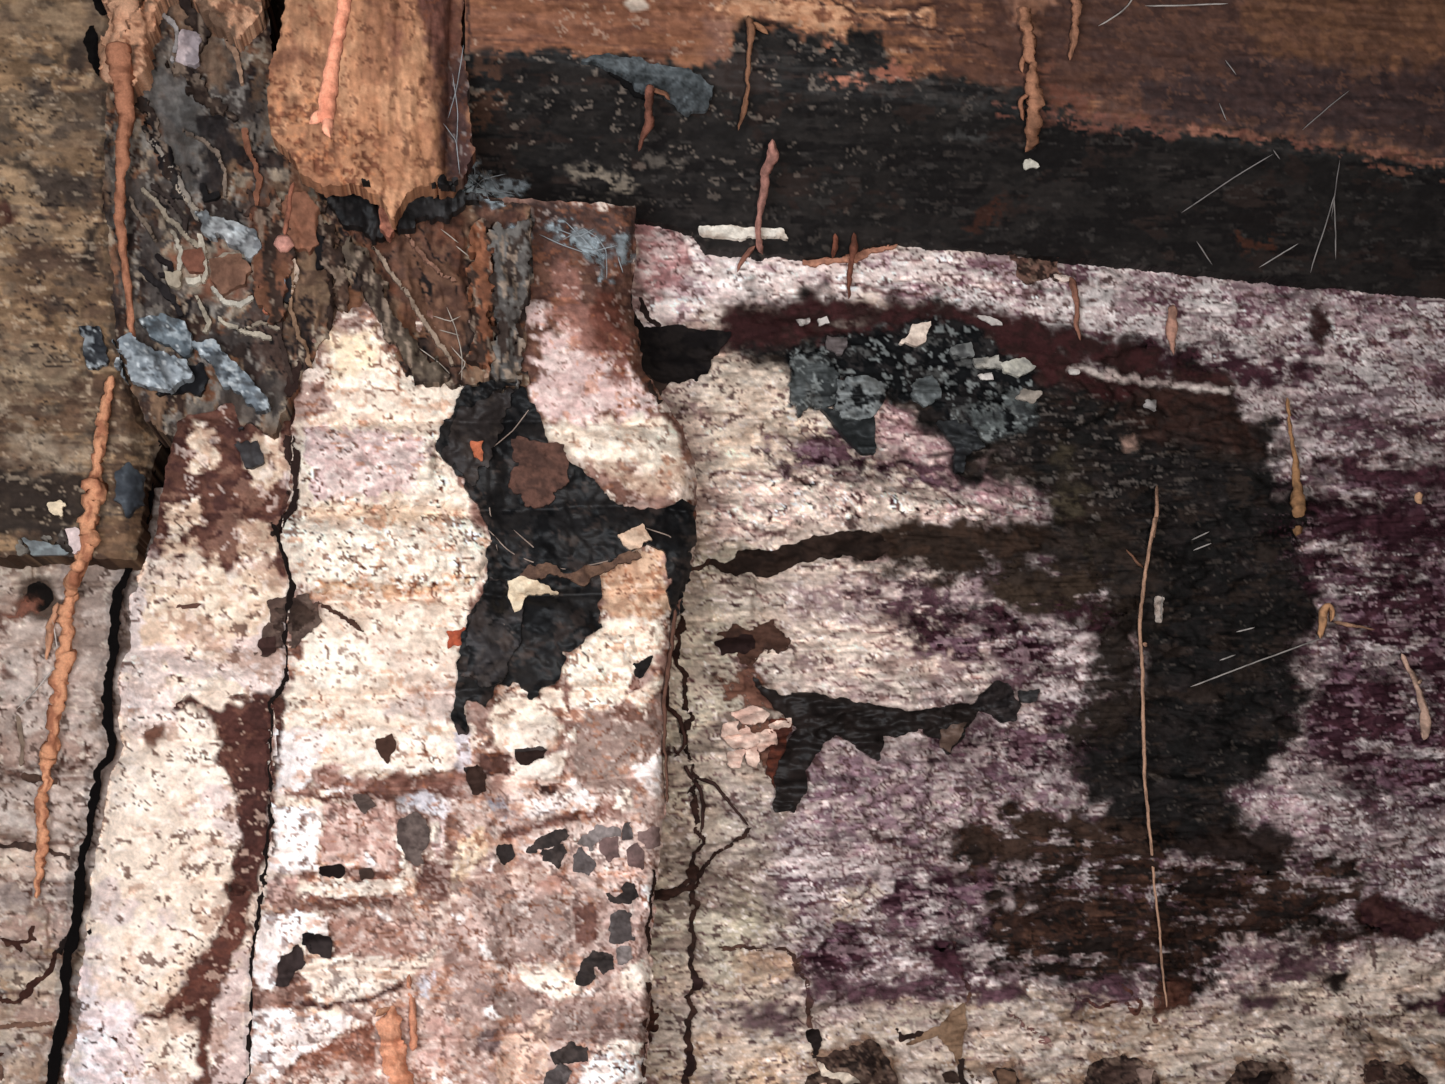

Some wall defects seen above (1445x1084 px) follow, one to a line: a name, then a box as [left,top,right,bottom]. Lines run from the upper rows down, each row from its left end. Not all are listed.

crack [83,0,107,76]
crack [284,360,302,400]
peeling [446,523,653,688]
water stain [722,280,1445,864]
crack [242,434,364,1084]
spalling [515,746,547,765]
spalling [711,619,793,788]
crack [639,609,814,1084]
spalling [805,1029,899,1084]
water stain [743,865,1023,1037]
water stain [1236,933,1354,1012]
water stain [1394,979,1445,1017]